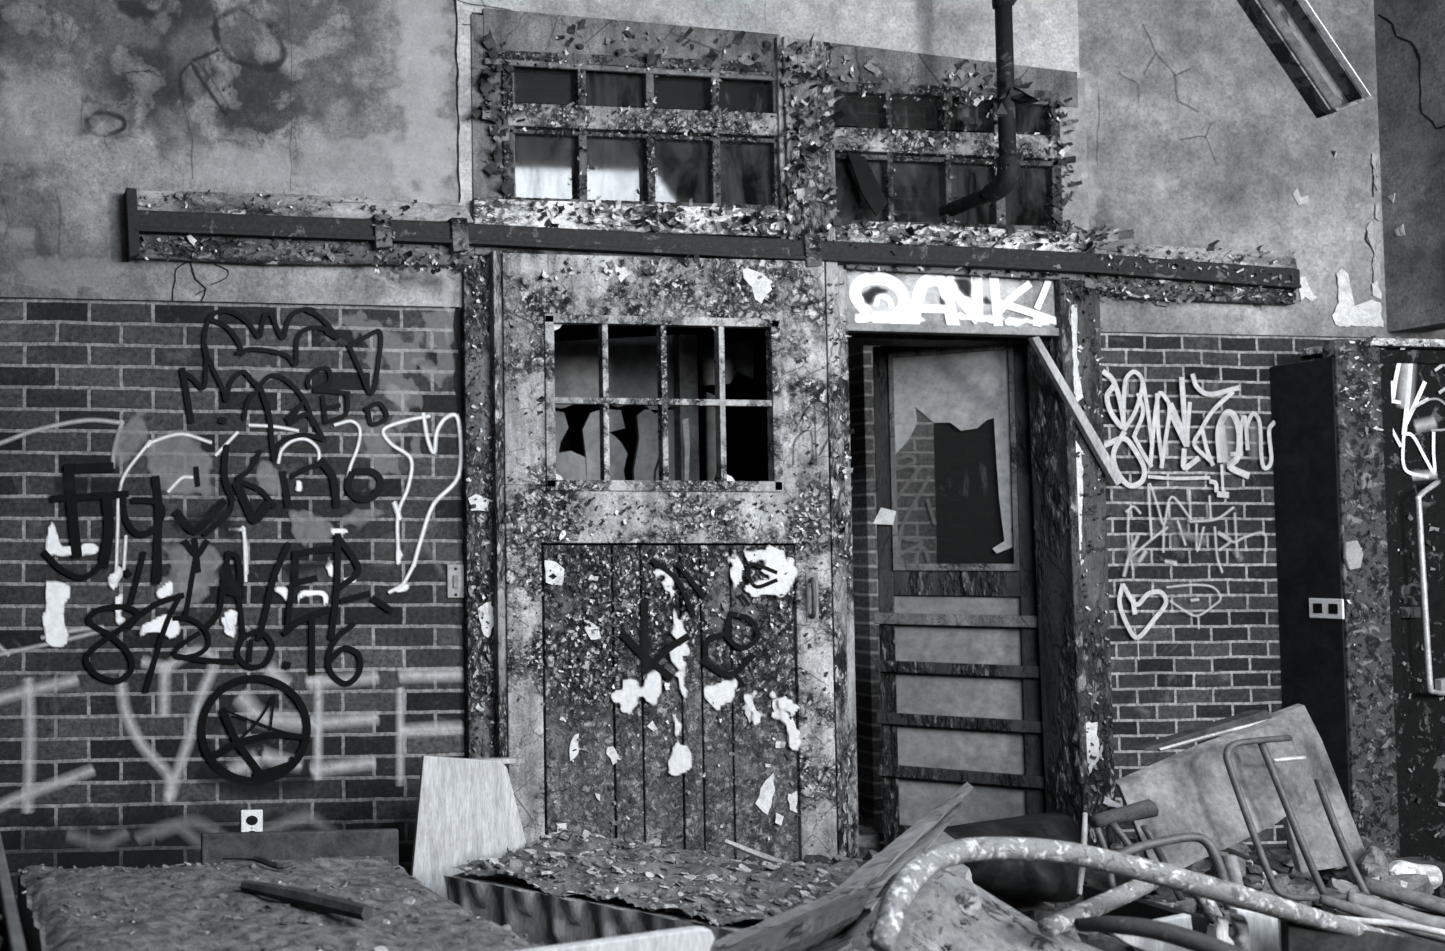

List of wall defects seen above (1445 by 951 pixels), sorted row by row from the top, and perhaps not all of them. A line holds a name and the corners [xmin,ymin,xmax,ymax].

damp [96,111,127,134]
damp [115,18,295,134]
crack [1378,14,1445,129]
spalling [1332,153,1440,437]
peeling [138,19,1317,850]